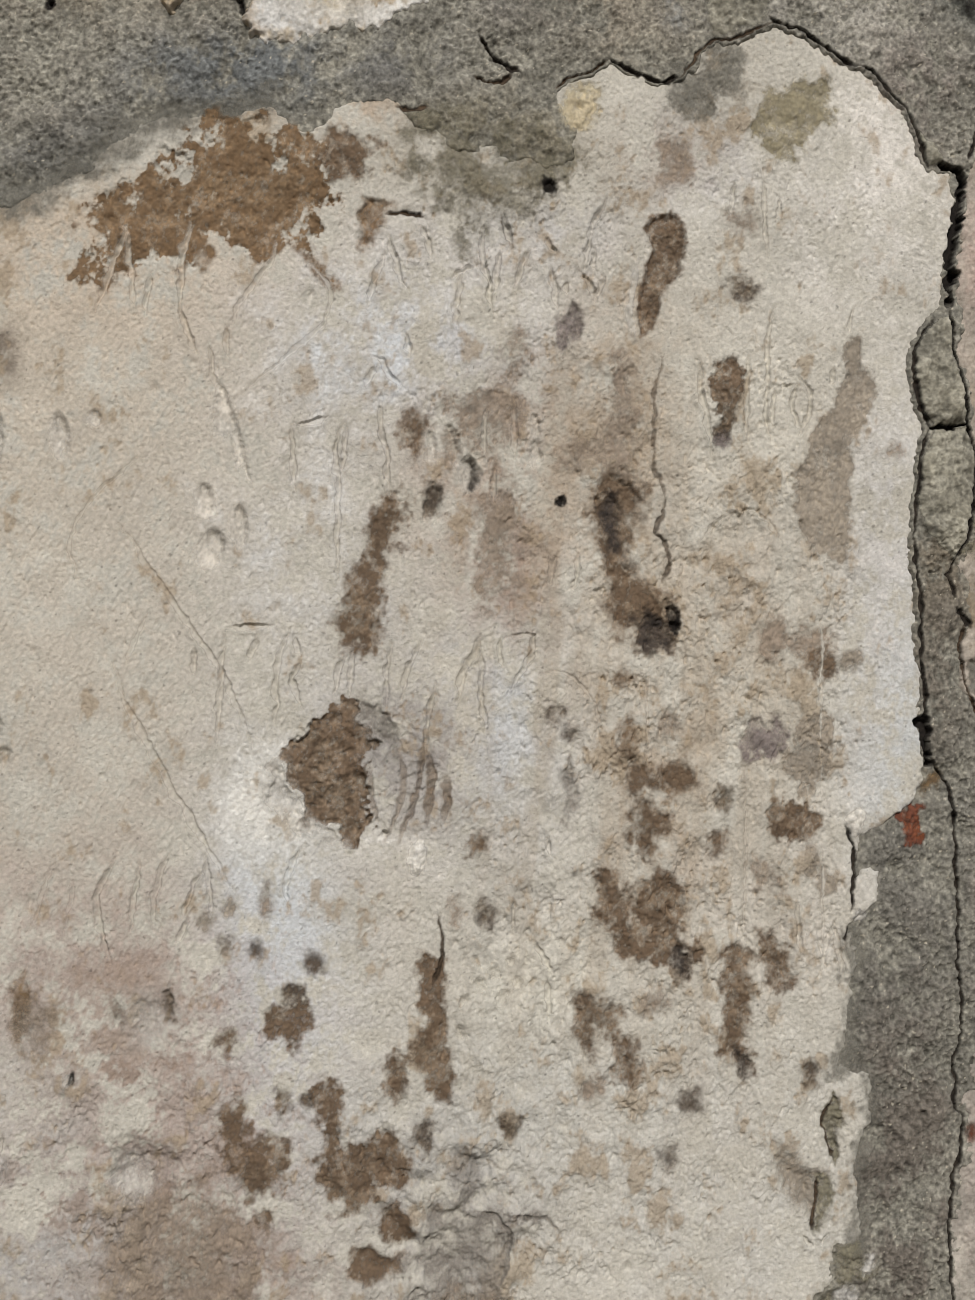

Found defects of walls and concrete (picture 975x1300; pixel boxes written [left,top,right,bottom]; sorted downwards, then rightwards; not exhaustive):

crack [476,36,521,85]
crack [398,104,428,112]
spalling [358,199,422,244]
spalling [542,175,557,193]
water stain [395,407,429,456]
water stain [443,330,533,461]
water stain [560,348,681,654]
water stain [336,495,412,656]
crack [557,19,975,1300]
spalling [263,694,396,849]
corrosion [894,772,940,847]
crack [433,919,445,981]